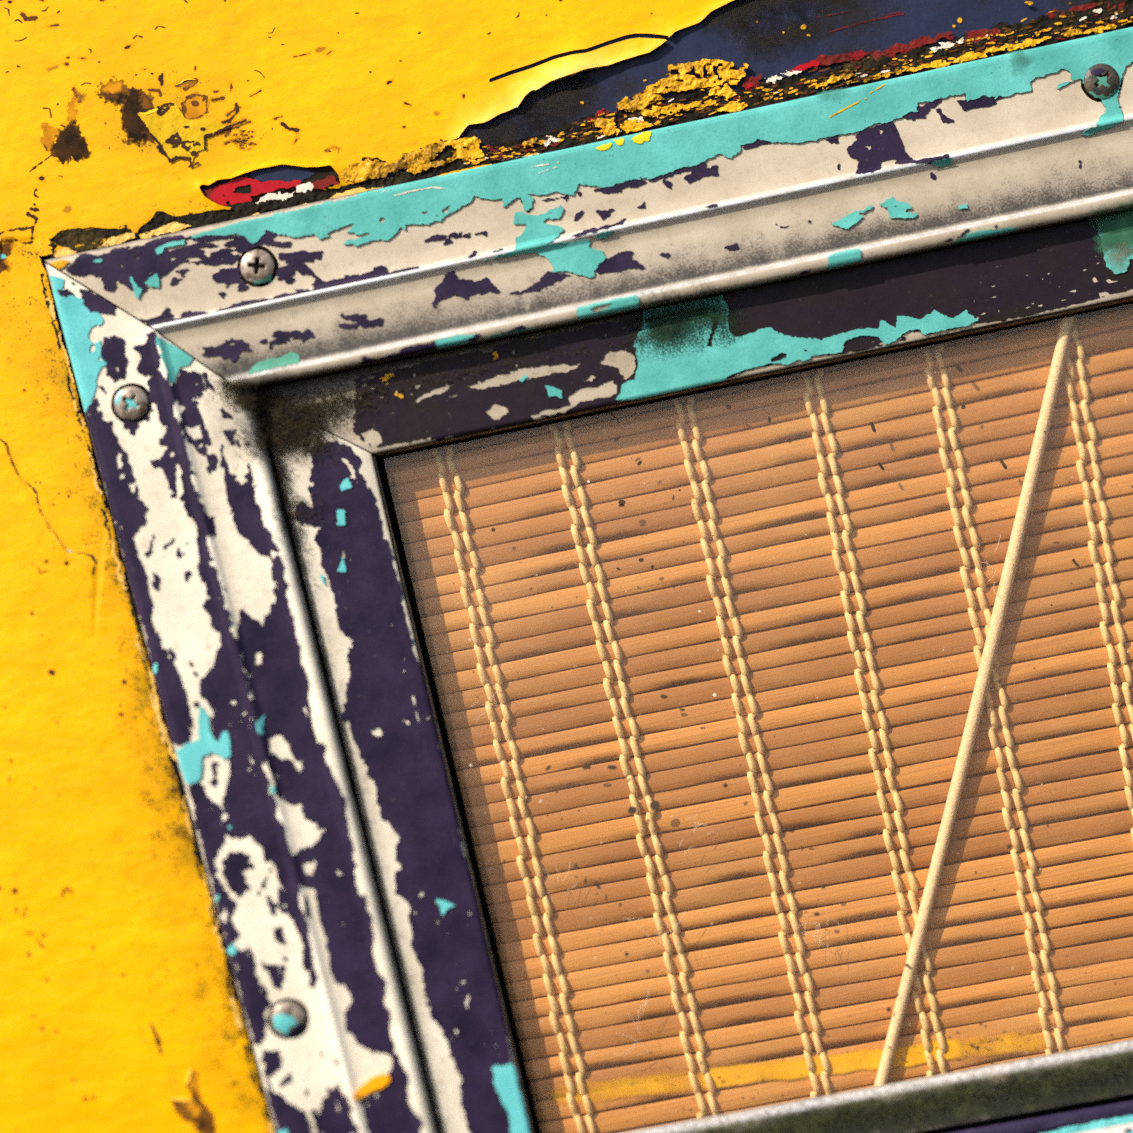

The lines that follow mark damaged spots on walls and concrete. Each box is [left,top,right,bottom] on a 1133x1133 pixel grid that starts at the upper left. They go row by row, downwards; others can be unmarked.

spalling [0,0,60,26]
crack [0,439,97,575]